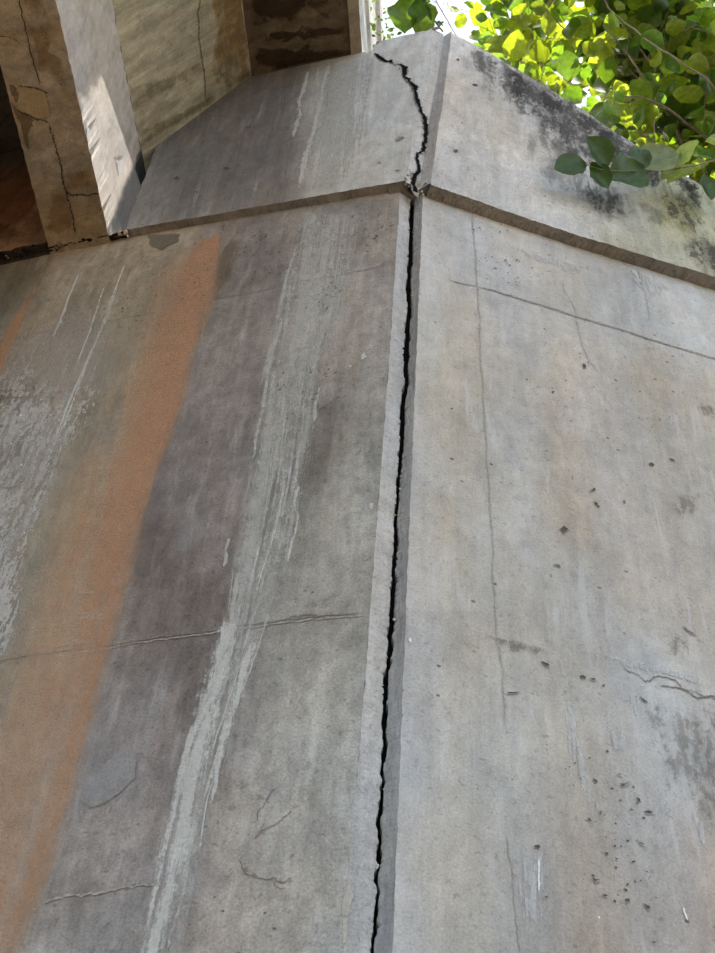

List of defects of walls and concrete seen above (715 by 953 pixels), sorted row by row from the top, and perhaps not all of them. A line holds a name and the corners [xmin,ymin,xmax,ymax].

crack [0,0,47,93]
spalling [17,87,50,119]
crack [197,0,206,98]
damp [486,56,640,165]
crack [17,110,99,232]
damp [586,188,625,217]
damp [665,178,715,269]
peeling [0,265,125,657]
crack [205,53,429,953]
crack [454,212,715,739]
crack [0,613,362,661]
damp [141,213,357,953]